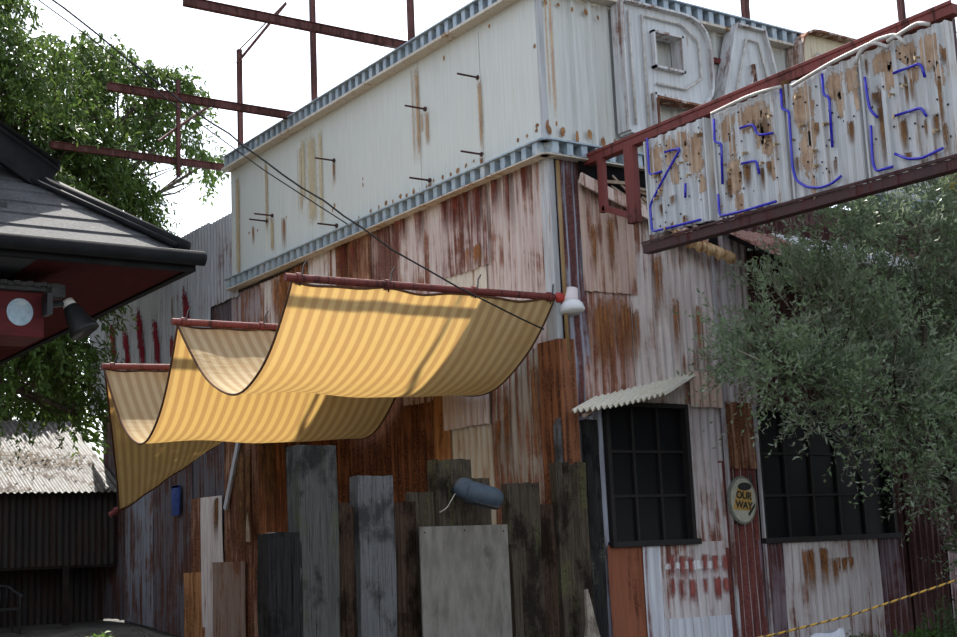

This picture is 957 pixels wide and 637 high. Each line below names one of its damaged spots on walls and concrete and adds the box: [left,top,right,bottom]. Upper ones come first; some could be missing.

corrosion [533,0,599,108]
corrosion [411,71,428,150]
corrosion [517,119,616,146]
corrosion [395,210,421,237]
corrosion [370,158,483,213]
corrosion [441,174,510,224]
corrosion [591,217,614,265]
corrosion [653,256,680,343]
corrosion [623,303,640,361]
corrosion [233,442,305,525]
corrosion [669,554,729,599]
corrosion [802,548,854,584]